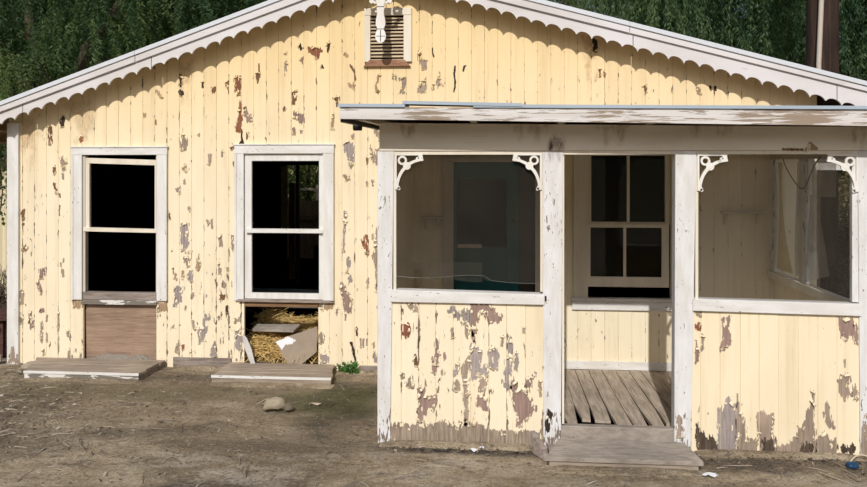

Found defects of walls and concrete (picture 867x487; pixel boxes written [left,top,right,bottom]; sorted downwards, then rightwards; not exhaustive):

peeling [297,40,331,69]
peeling [200,75,253,140]
peeling [343,129,379,182]
peeling [156,206,201,313]
peeling [319,211,353,321]
peeling [361,226,377,293]
peeling [175,262,243,358]
peeling [719,315,732,352]
peeling [839,316,858,346]
peeling [390,304,553,446]
peeling [837,359,859,402]
peeling [717,388,837,453]